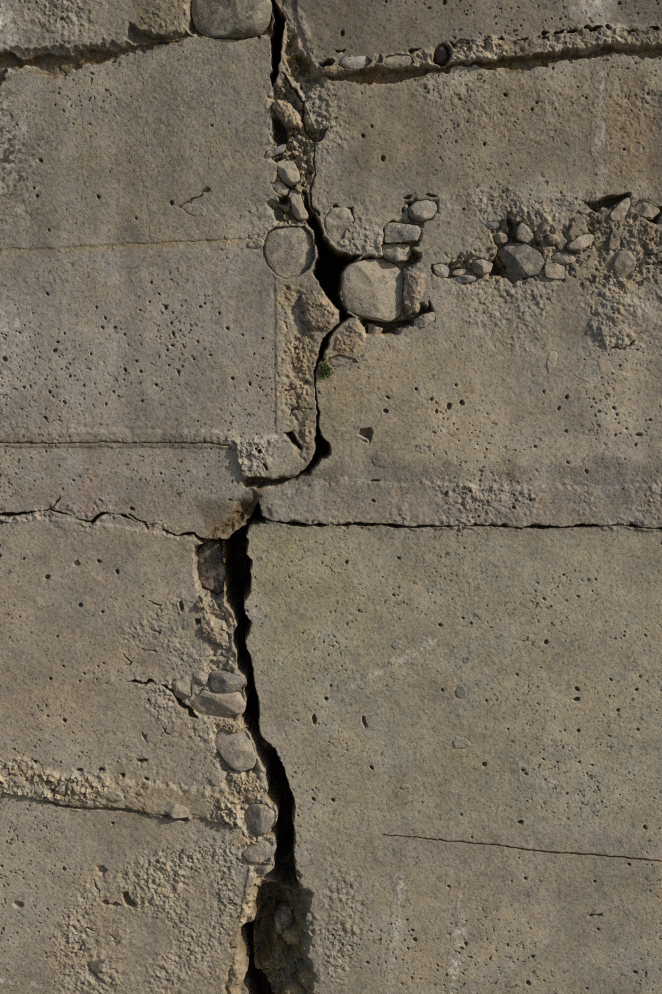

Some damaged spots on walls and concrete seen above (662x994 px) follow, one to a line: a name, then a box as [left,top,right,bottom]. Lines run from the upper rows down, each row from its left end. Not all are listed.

crack [0,511,37,526]
crack [45,0,459,881]
spalling [248,226,325,472]
crack [466,521,662,531]
spalling [178,585,246,788]
spalling [93,865,138,908]
spalling [173,801,321,994]
crack [240,918,275,994]